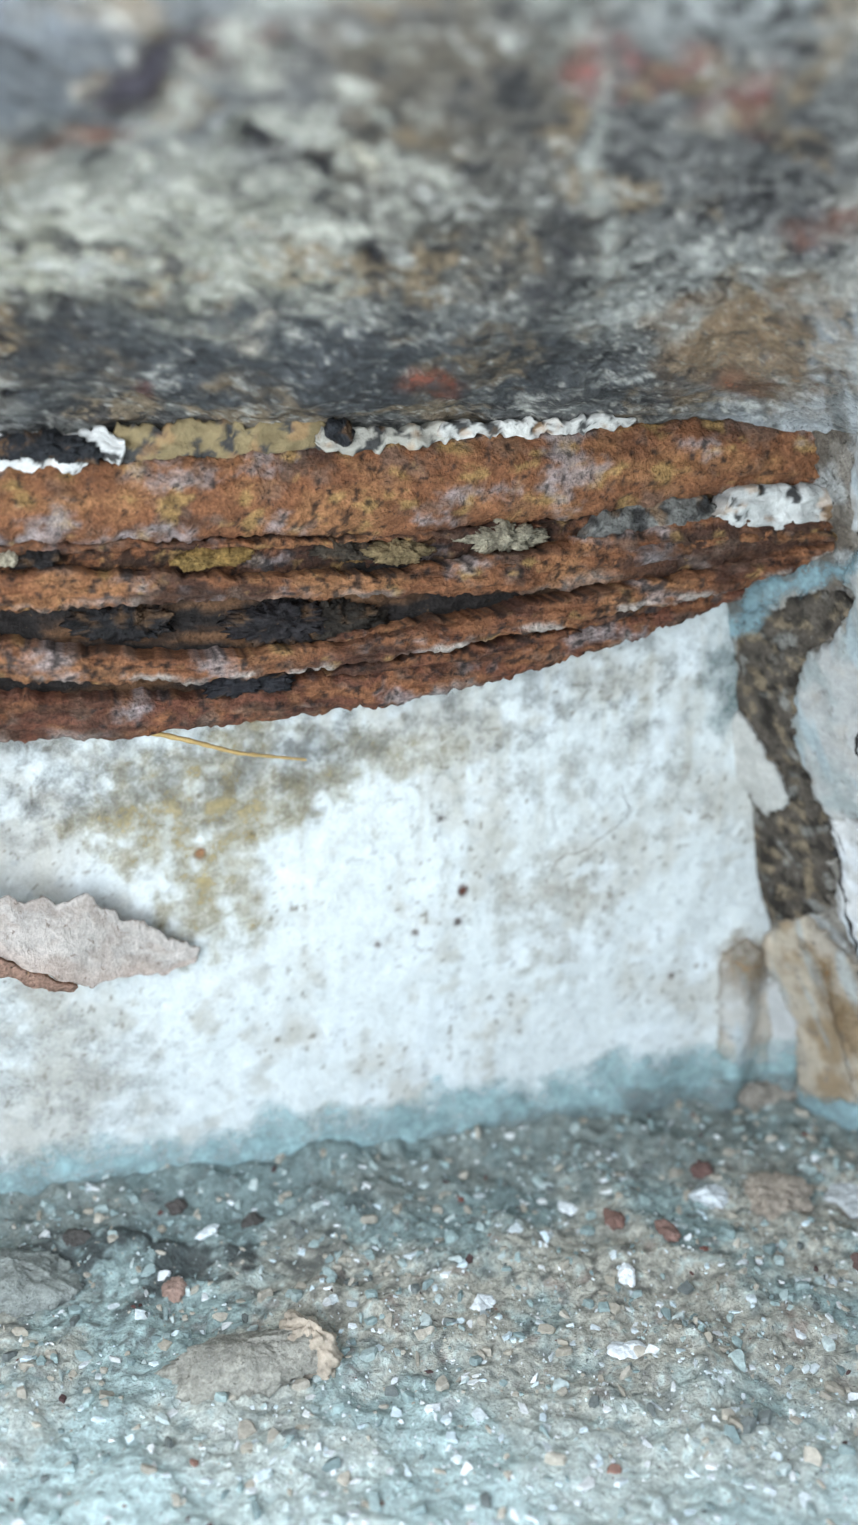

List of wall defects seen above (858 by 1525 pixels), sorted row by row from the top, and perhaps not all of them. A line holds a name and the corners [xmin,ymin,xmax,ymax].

water stain [229,23,276,88]
water stain [336,77,388,117]
water stain [205,108,457,220]
water stain [0,140,627,424]
peeling [849,432,858,533]
rust [0,417,838,744]
crack [850,733,858,756]
spalling [731,551,858,1106]
crack [818,809,858,957]
crack [823,970,855,1095]